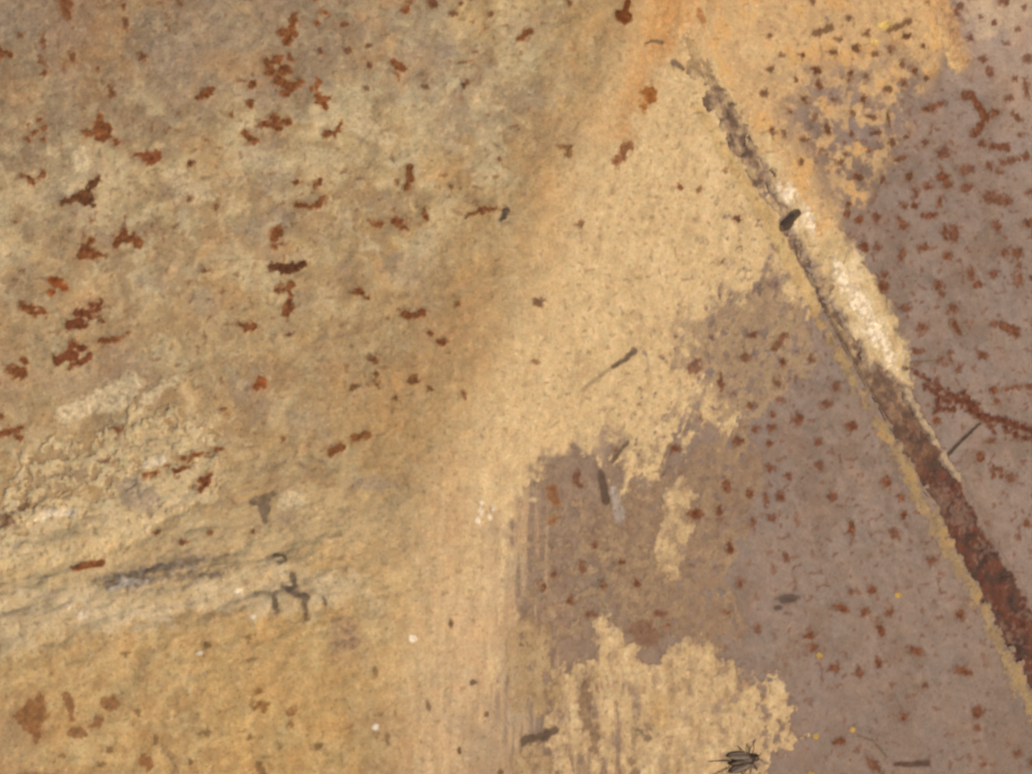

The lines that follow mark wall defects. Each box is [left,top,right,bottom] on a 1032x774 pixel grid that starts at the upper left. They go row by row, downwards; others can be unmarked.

rust [226,0,352,148]
rust [79,63,165,168]
rust [56,170,105,215]
rust [290,176,331,212]
rust [16,274,133,372]
rust [74,225,146,263]
rust [264,222,312,339]
water stain [757,156,963,482]
crack [902,364,1032,445]
rust [140,445,228,497]
water stain [596,468,627,525]
water stain [518,725,562,749]